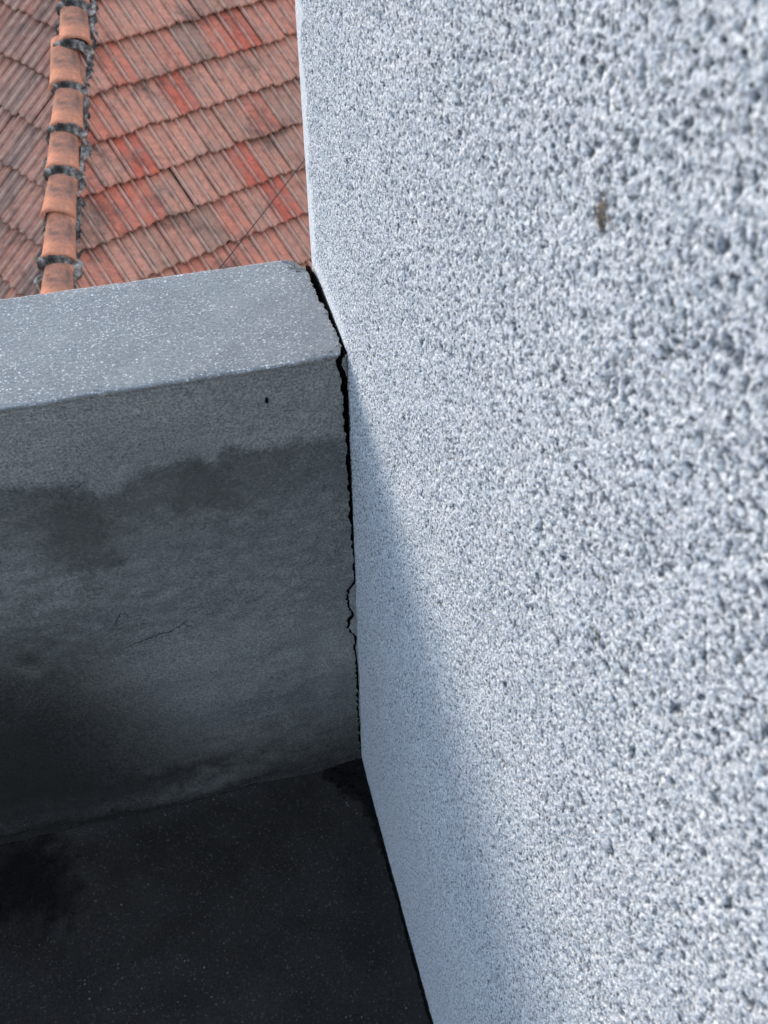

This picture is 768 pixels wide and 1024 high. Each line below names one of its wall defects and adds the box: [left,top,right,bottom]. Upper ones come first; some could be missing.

leakage [0,443,345,557]
crack [301,265,361,756]